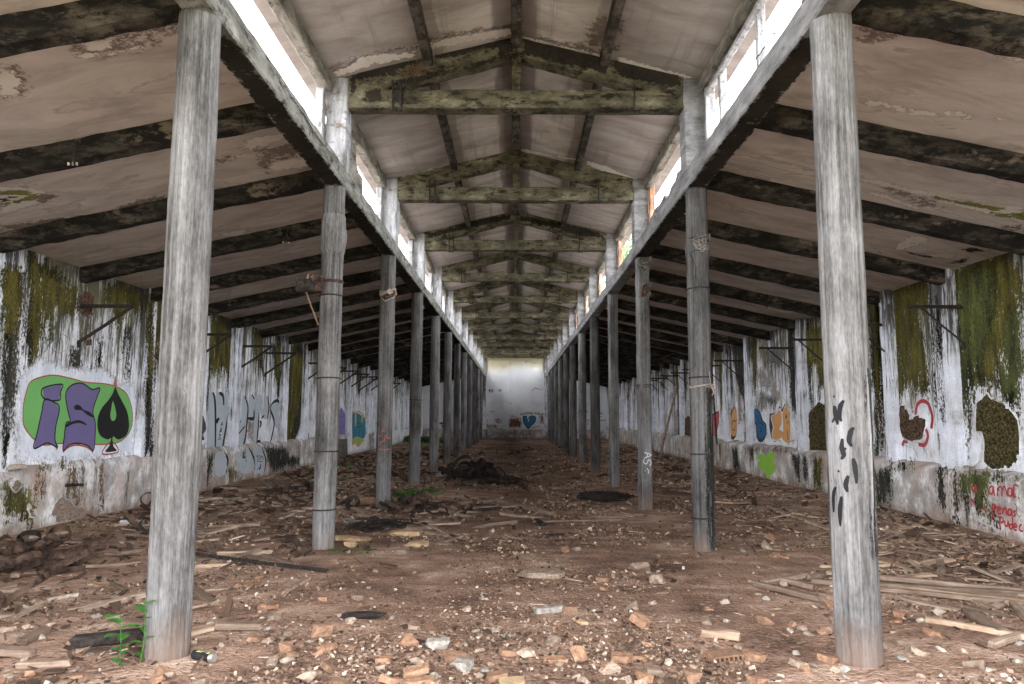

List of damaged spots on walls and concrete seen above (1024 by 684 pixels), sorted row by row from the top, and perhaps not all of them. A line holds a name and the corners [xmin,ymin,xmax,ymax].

water stain [330,17,692,104]
water stain [520,149,638,179]
water stain [896,236,986,328]
water stain [0,252,71,469]
water stain [68,297,162,457]
spalling [899,404,927,443]
water stain [899,285,1002,532]
spalling [968,393,1022,471]